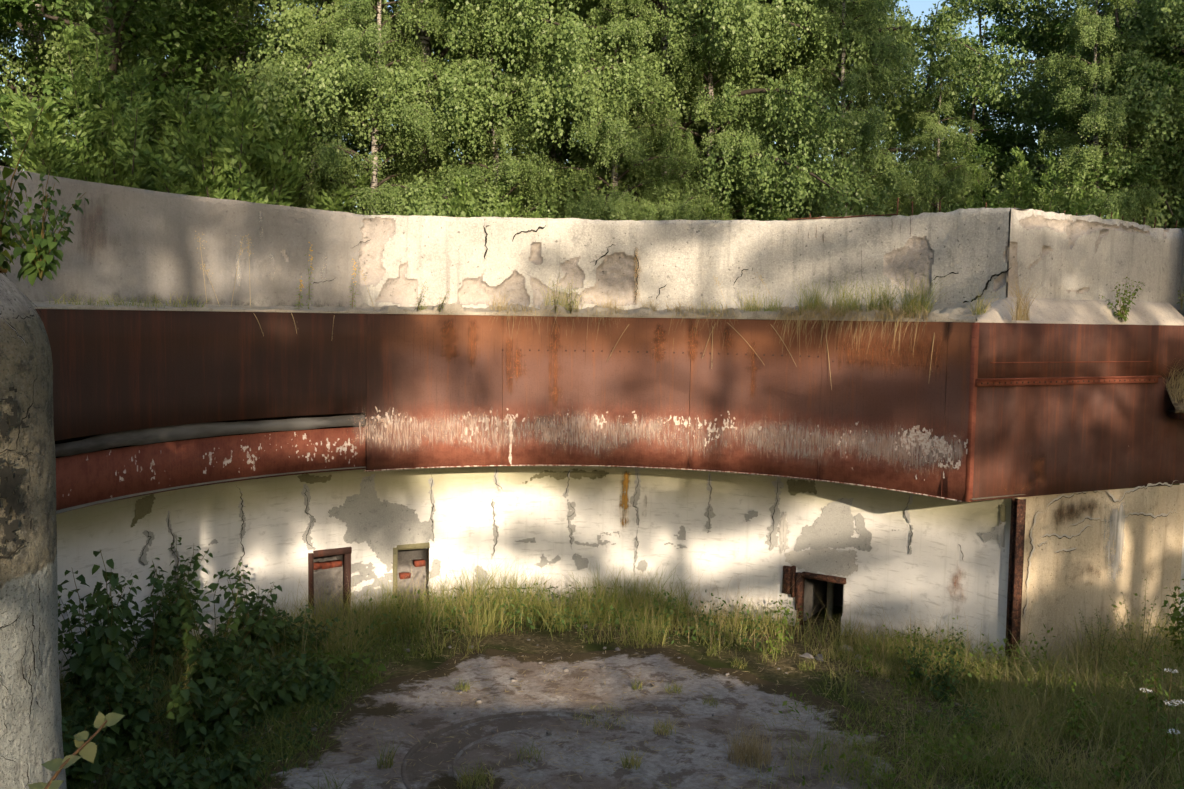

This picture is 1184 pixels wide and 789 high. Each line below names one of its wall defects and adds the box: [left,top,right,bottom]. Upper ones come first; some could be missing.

spalling [357,217,419,306]
spalling [456,242,637,309]
spalling [883,236,934,298]
crack [0,297,43,559]
rust [35,309,1184,526]
peeling [328,473,433,599]
peeling [427,558,441,586]
peeling [787,479,817,496]
peeling [794,498,872,552]
crack [1023,480,1178,620]